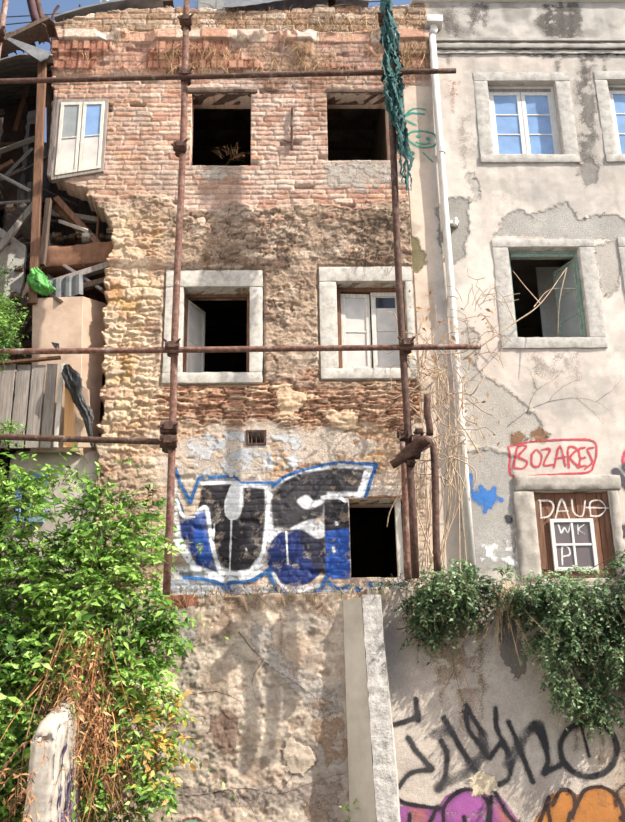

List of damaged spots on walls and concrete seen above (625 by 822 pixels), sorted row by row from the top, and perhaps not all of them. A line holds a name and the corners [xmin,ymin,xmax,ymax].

spalling [577,157,600,186]
peeling [435,172,481,265]
spalling [411,236,427,273]
peeling [493,202,625,299]
crack [507,366,617,427]
flaking render [186,427,307,480]
peeling [460,327,552,573]
crack [191,632,340,727]
peeling [250,623,348,767]
spalling [208,709,240,755]
peeling [169,774,348,822]